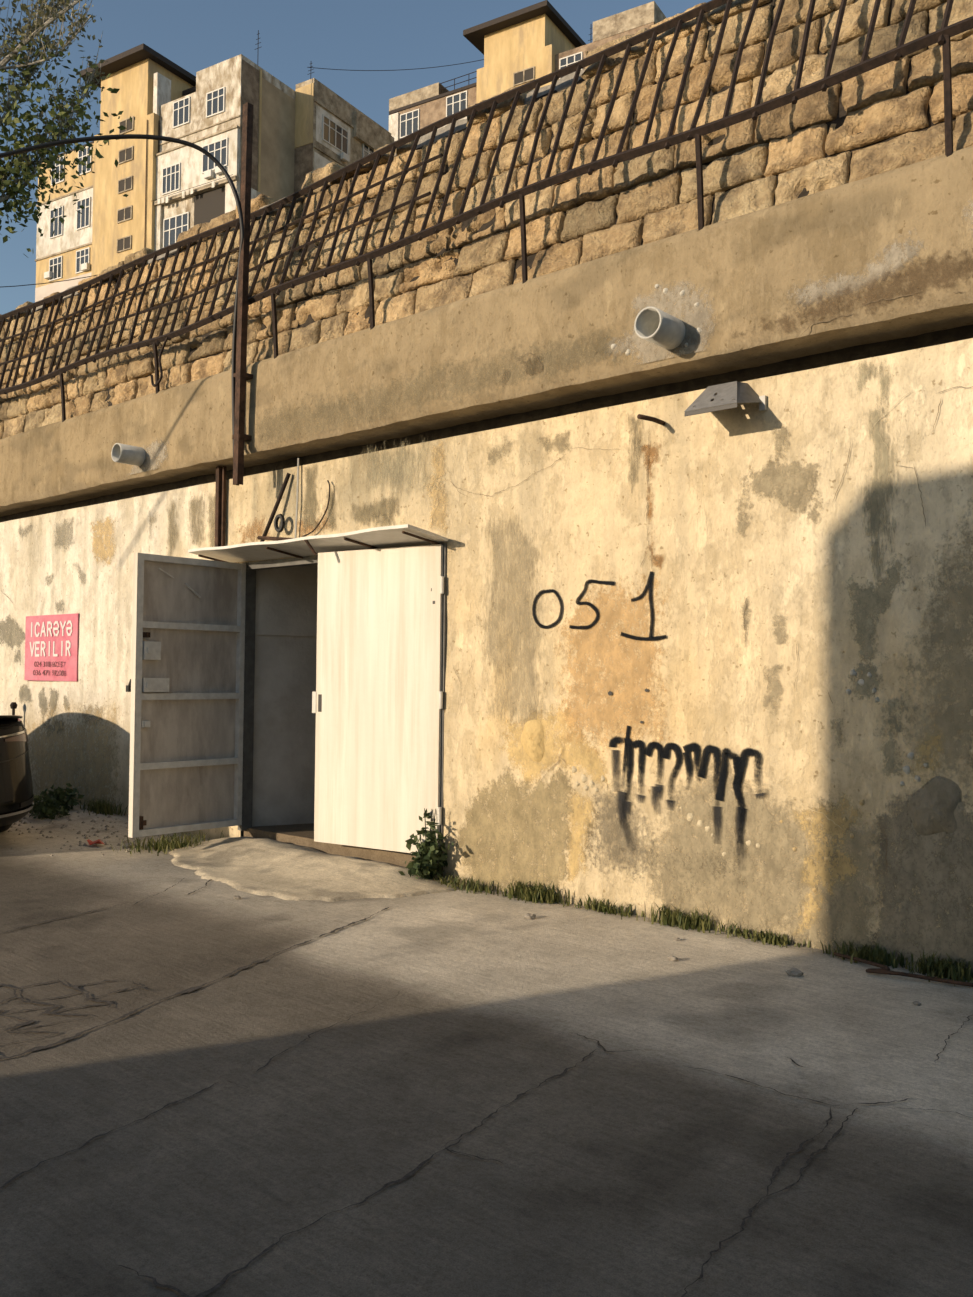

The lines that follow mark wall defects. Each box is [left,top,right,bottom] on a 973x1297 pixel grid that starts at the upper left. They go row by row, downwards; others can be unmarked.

rust [642,445,658,469]
crack [0,907,389,1059]
crack [0,996,396,1188]
crack [118,1033,632,1297]
crack [681,1056,972,1297]
crack [935,1015,972,1061]